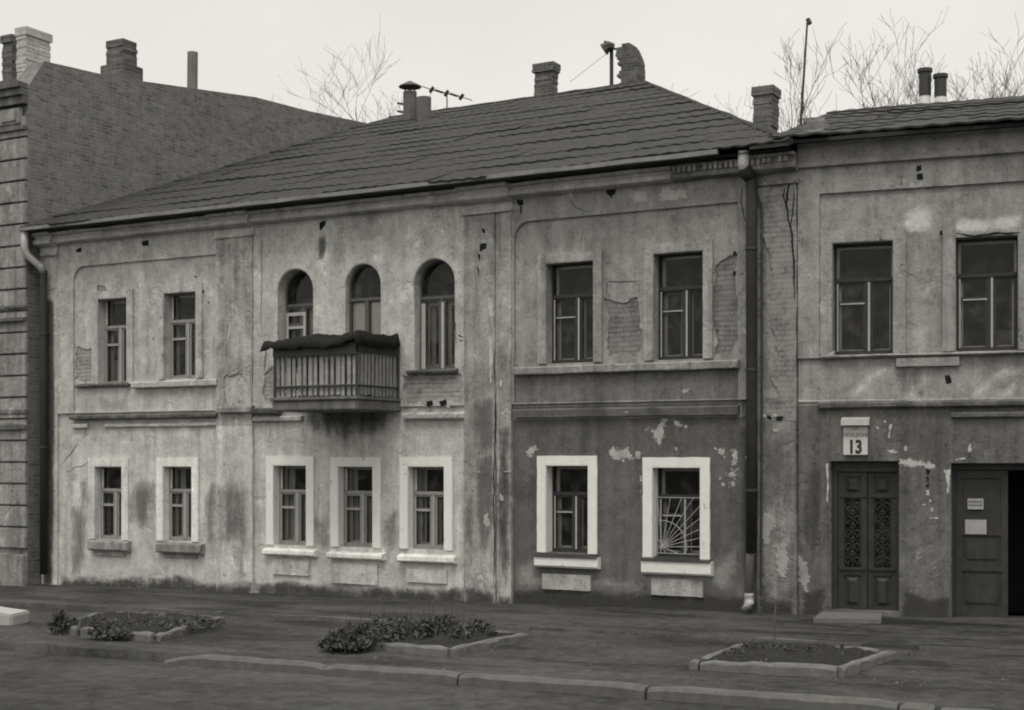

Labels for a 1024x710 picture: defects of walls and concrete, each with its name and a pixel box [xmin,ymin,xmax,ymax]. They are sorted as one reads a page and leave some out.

flaking render [604,297,642,357]
flaking render [713,251,738,355]
crack [782,184,799,396]
damp [44,300,822,615]
peeling [608,447,641,462]
peeling [645,417,687,447]
peeling [714,447,746,488]
peeling [876,420,972,519]
peeling [758,512,810,593]
damp [903,594,948,618]